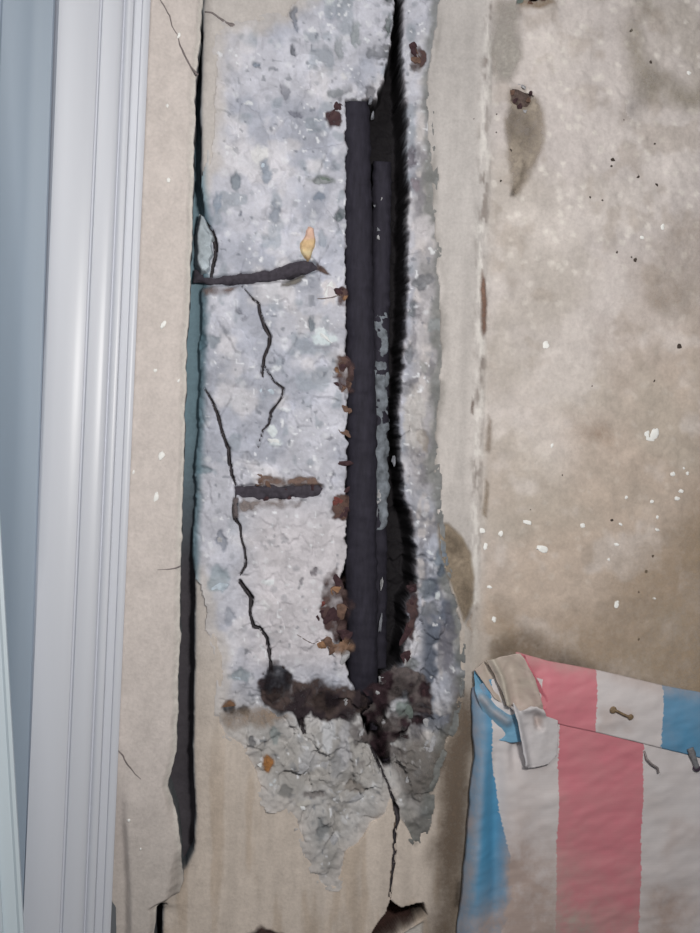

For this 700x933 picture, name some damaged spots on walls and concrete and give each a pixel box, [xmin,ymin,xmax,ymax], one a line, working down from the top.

corrosion [409,42,427,71]
leakage [506,97,543,194]
crack [158,0,273,858]
crack [242,286,285,449]
corrosion [233,474,322,517]
spalling [192,0,473,892]
corrosion [222,573,439,794]
crack [370,747,400,897]
crack [155,903,163,933]
spalling [372,900,413,933]